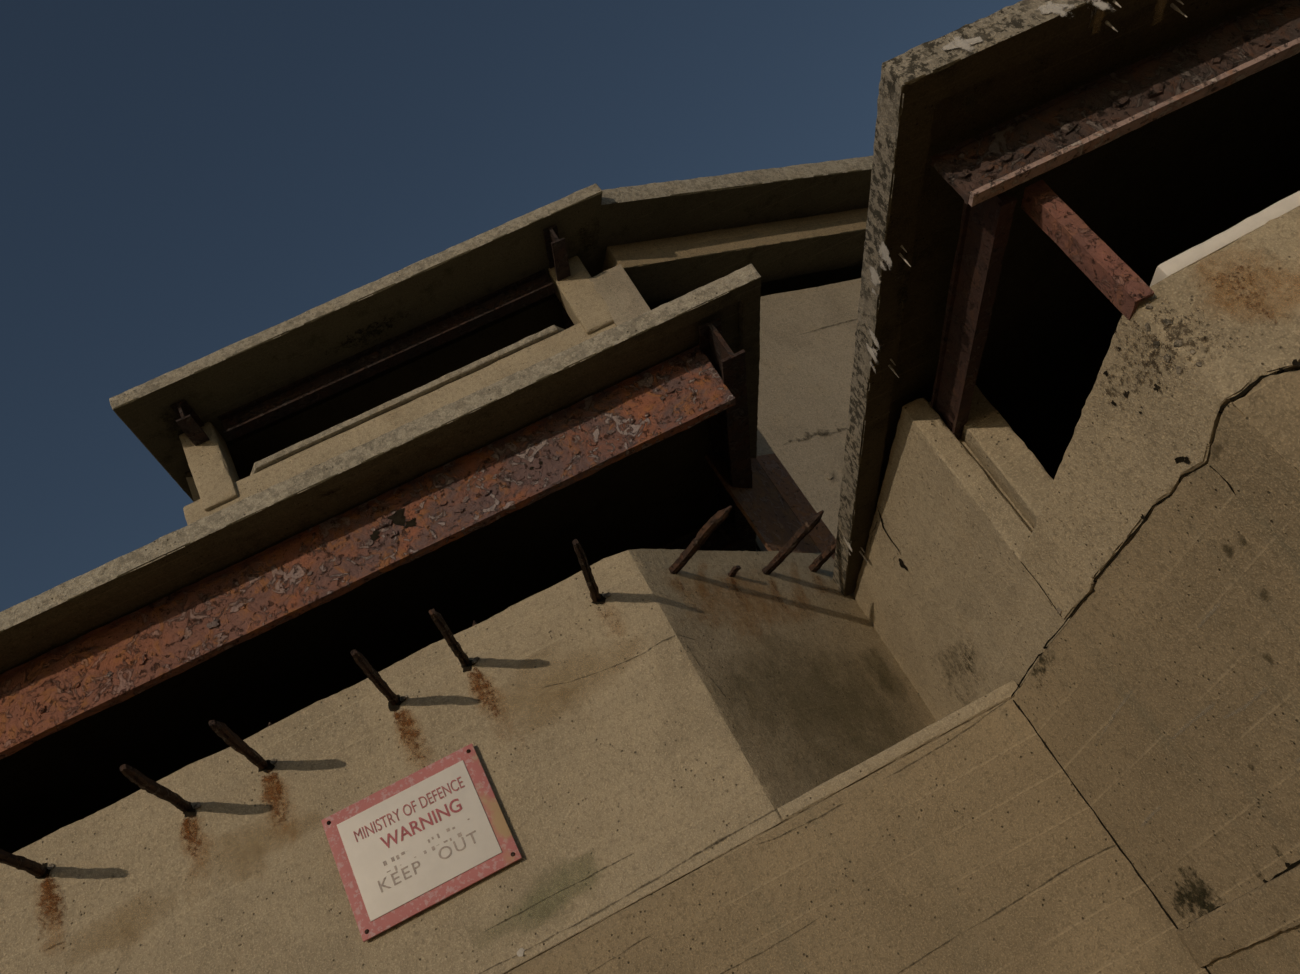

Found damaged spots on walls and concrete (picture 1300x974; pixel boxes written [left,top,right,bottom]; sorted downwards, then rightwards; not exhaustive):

spalling [1094,285,1250,439]
crack [1218,359,1300,413]
crack [870,507,908,571]
rust [461,656,499,716]
crack [894,456,1236,929]
rust [388,694,425,758]
rust [258,758,289,825]
rust [181,802,201,856]
rust [35,863,63,931]
damp [1172,867,1220,917]
crack [1255,852,1300,889]